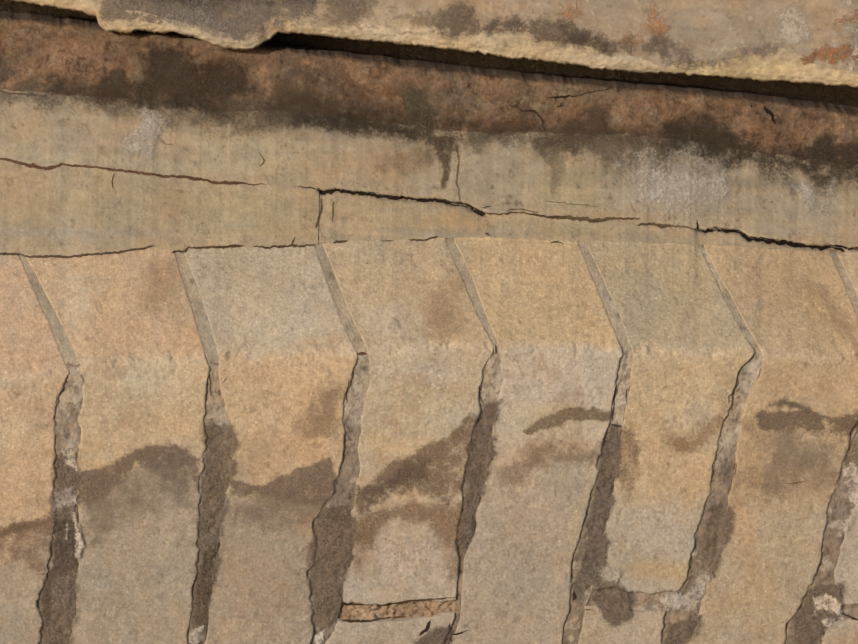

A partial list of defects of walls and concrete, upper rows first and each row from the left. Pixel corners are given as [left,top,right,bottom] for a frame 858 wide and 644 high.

water stain [100,0,377,40]
water stain [390,2,723,70]
corrosion [801,44,858,65]
crack [509,86,612,131]
crack [751,105,776,124]
crack [0,143,858,258]
water stain [416,136,454,189]
water stain [626,151,728,223]
water stain [750,399,858,507]
water stain [0,400,501,644]
water stain [523,387,638,626]
water stain [791,584,845,644]